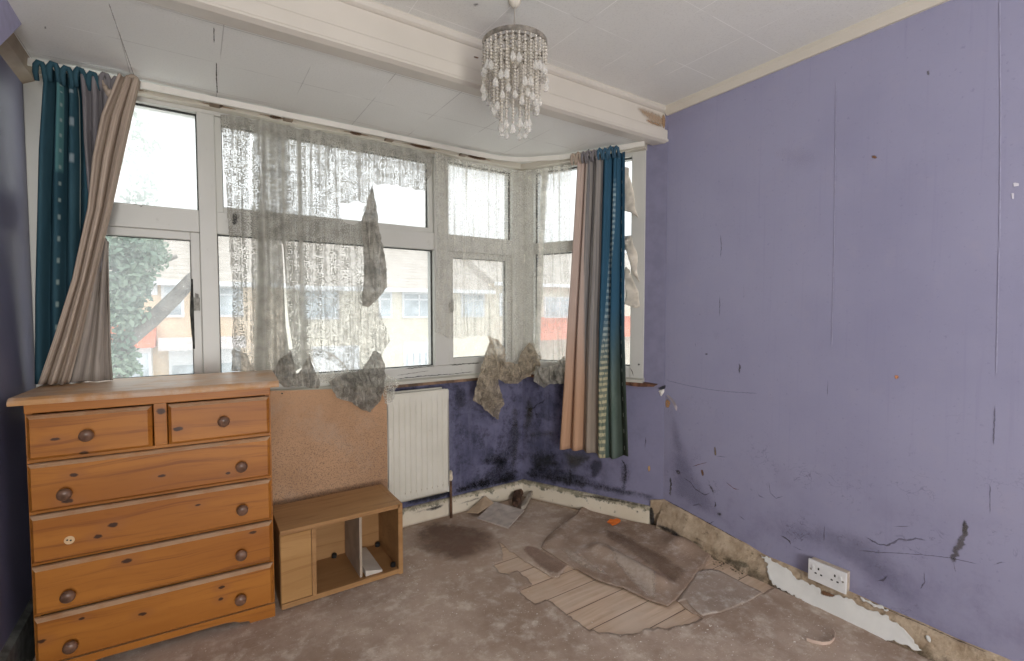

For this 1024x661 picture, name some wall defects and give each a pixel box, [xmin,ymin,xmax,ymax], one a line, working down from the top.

damp [408,448,637,510]
damp [421,525,489,557]
peeling [761,555,931,651]